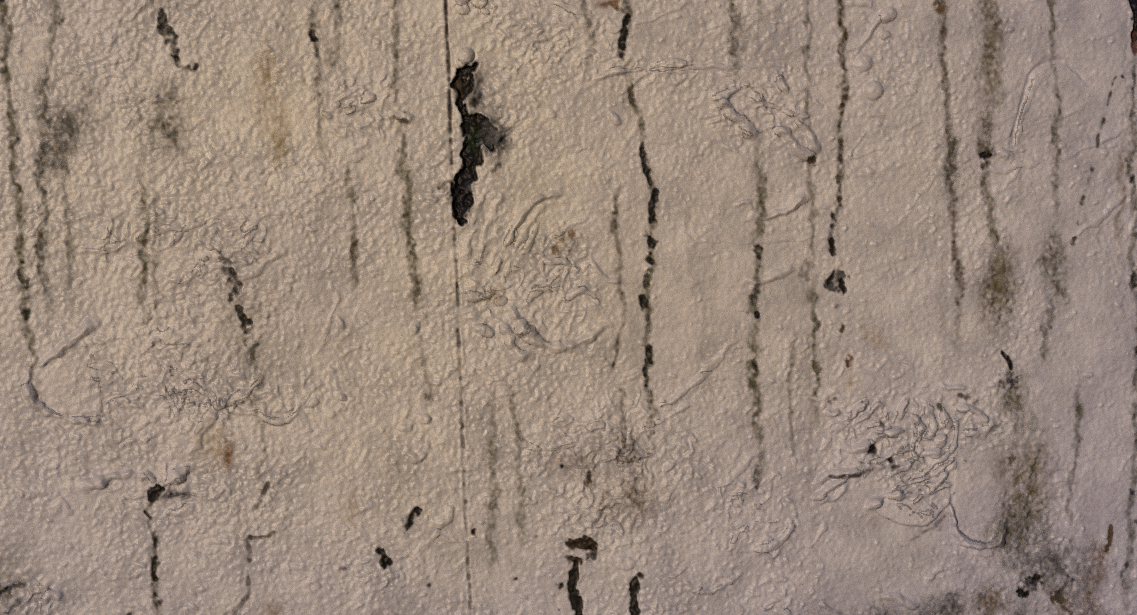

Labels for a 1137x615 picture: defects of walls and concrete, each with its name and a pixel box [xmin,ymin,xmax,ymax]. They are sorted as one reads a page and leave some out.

damp [157,8,198,70]
damp [618,0,632,58]
damp [0,0,47,349]
peeling [437,62,508,226]
damp [828,0,848,256]
crack [1080,0,1137,205]
damp [628,85,659,403]
damp [810,271,849,395]
damp [144,484,188,520]
damp [376,548,393,569]
damp [559,535,598,615]
damp [629,572,643,615]